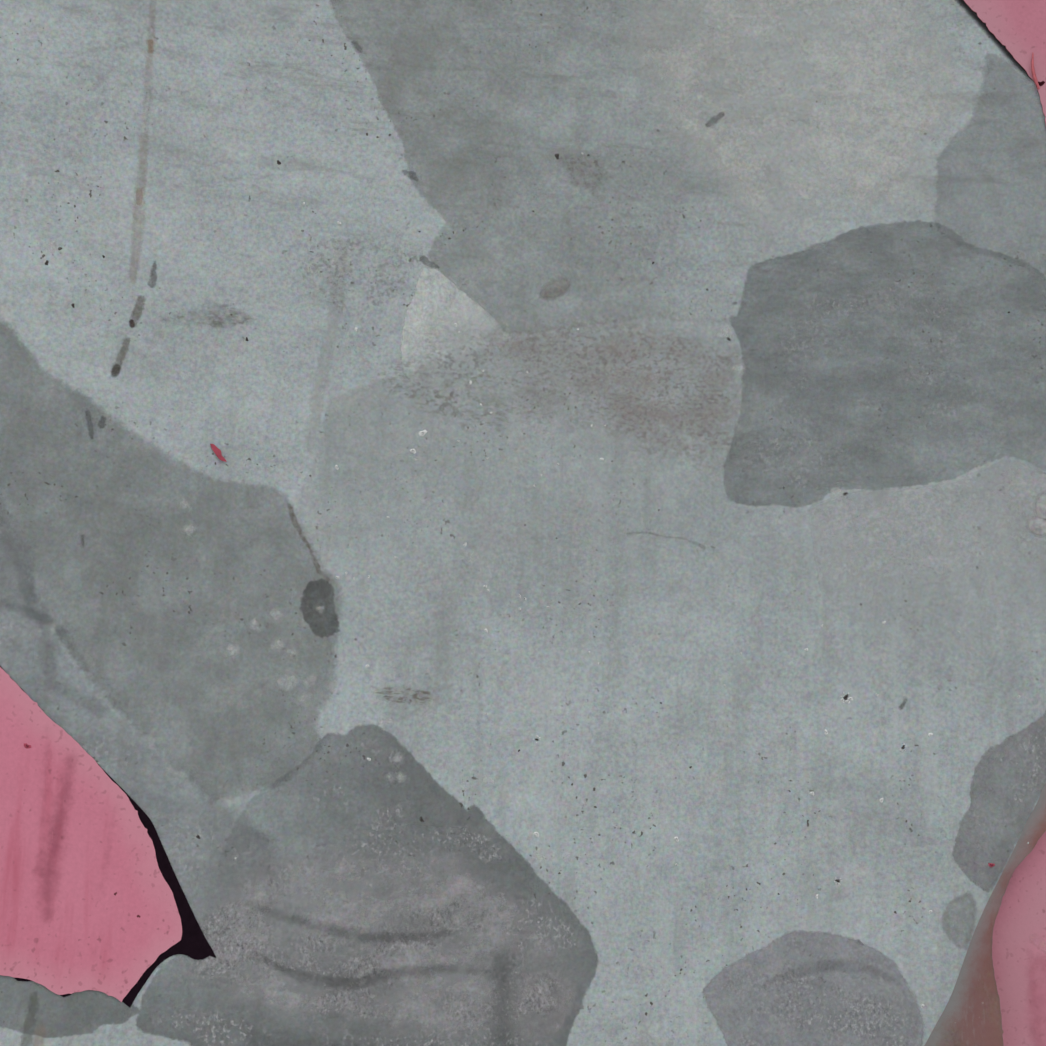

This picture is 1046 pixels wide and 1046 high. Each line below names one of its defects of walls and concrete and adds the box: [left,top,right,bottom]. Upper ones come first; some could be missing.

water stain [748,228,896,321]
water stain [301,580,339,637]
peeling [0,667,182,1002]
water stain [953,714,1046,890]
water stain [139,742,597,1046]
water stain [21,991,134,1040]
water stain [703,931,923,1046]